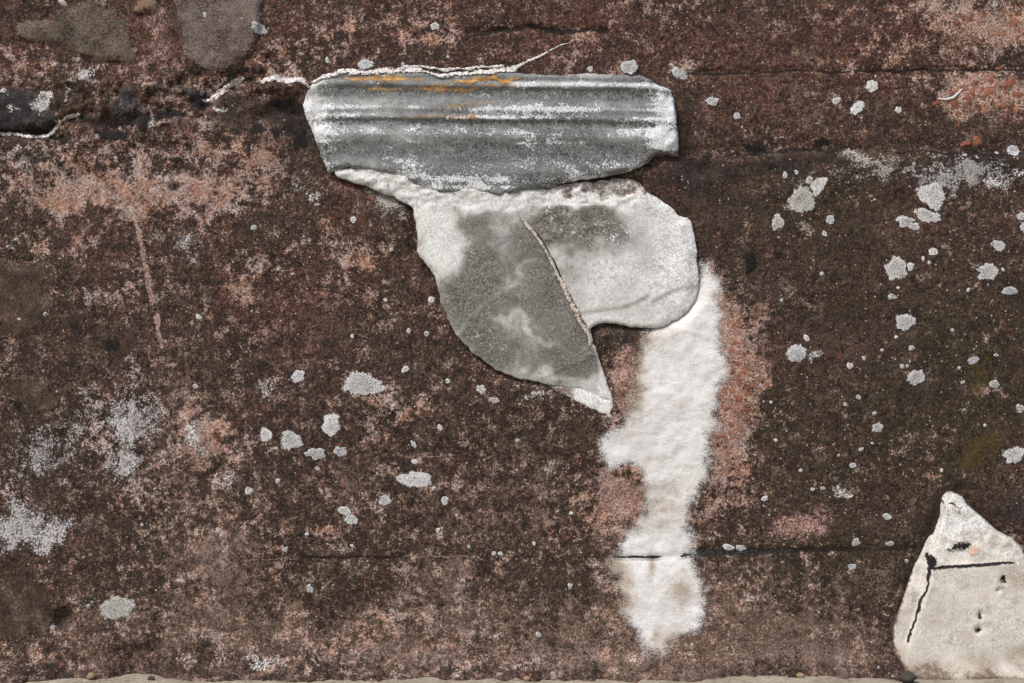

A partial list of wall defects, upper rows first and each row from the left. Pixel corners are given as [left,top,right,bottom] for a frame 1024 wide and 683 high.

crack [0,66,249,139]
corrosion [345,74,517,119]
crack [520,215,592,345]
leakage [598,261,730,656]
crack [613,545,1014,642]